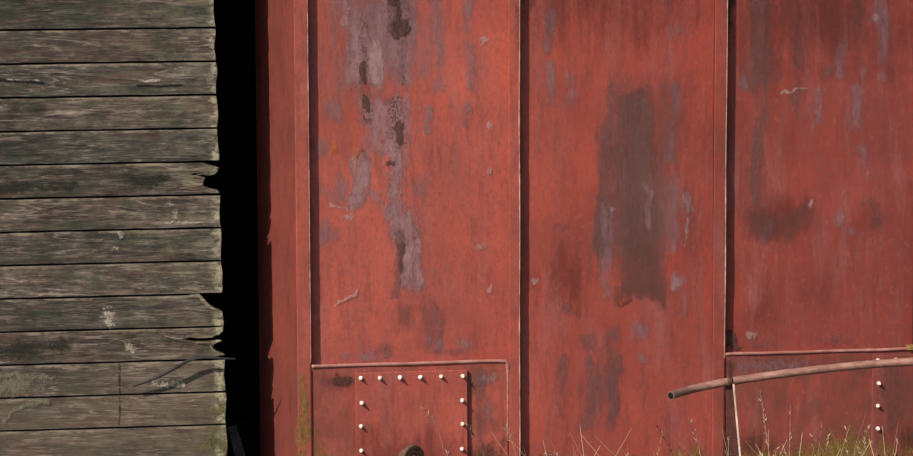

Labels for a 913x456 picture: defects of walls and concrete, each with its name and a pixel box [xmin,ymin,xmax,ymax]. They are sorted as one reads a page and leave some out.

peeling [330,0,424,292]